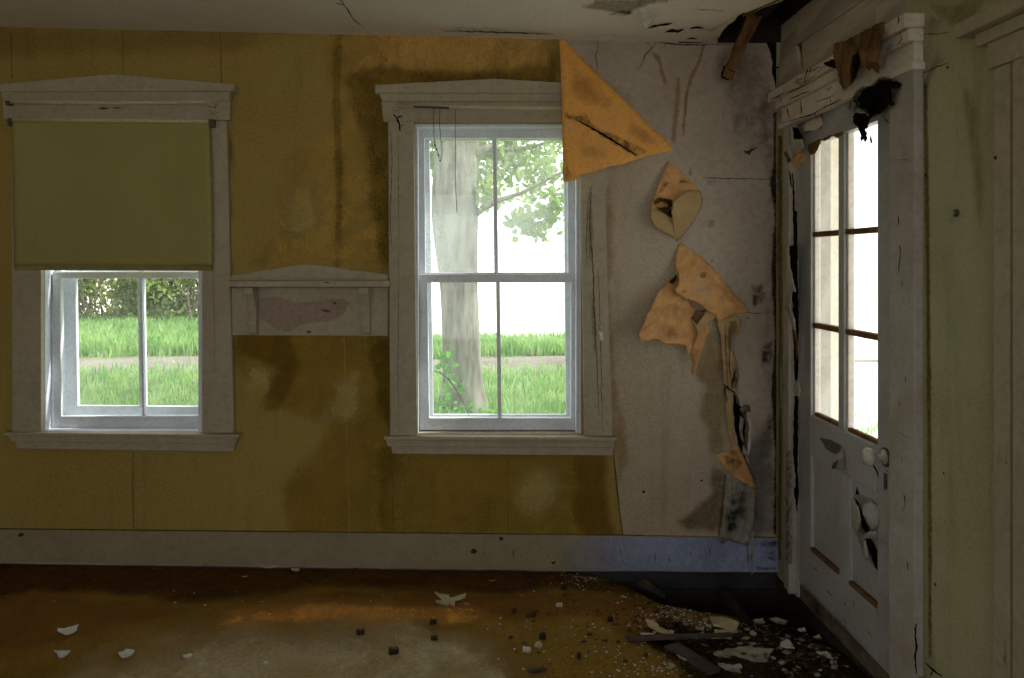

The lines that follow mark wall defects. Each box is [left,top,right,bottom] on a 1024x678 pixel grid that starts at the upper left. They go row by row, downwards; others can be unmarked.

damp [265,34,556,266]
flaking render [767,43,779,87]
spalling [784,117,823,166]
damp [233,335,610,535]
damp [684,113,792,563]
flaking render [733,394,751,464]